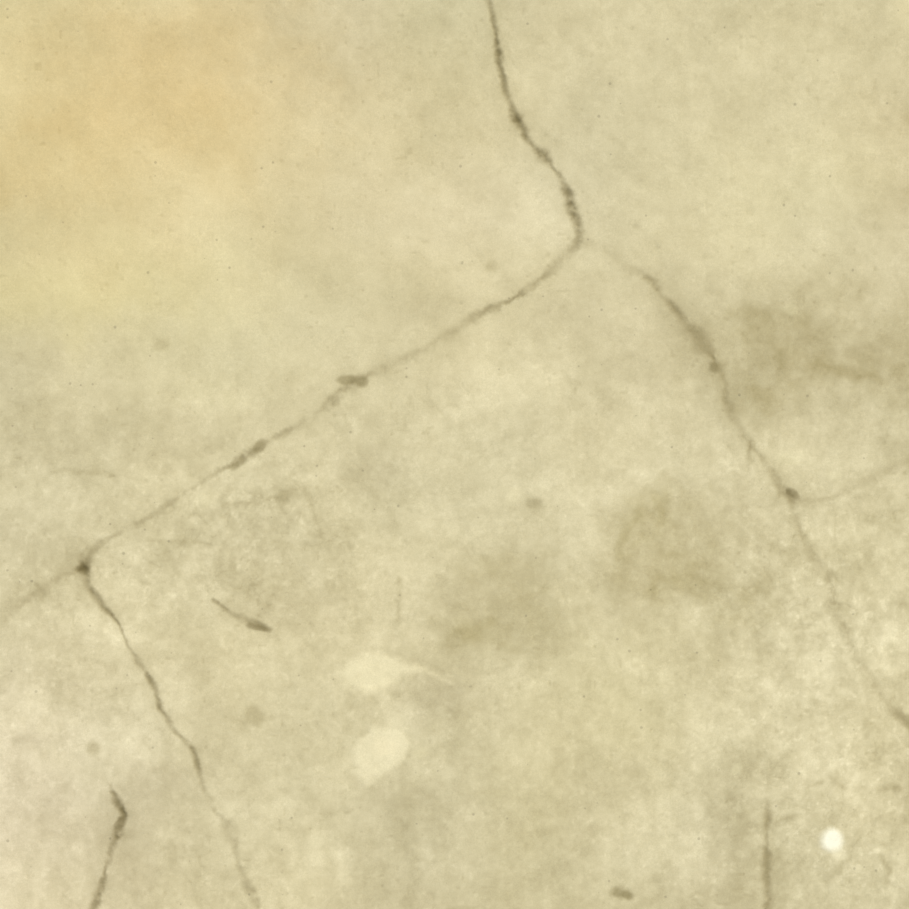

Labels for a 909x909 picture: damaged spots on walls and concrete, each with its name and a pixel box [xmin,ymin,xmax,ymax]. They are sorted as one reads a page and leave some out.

crack [0,0,596,909]
crack [577,232,909,747]
crack [807,774,849,792]
crack [871,775,907,797]
crack [746,796,814,909]
crack [876,850,895,888]